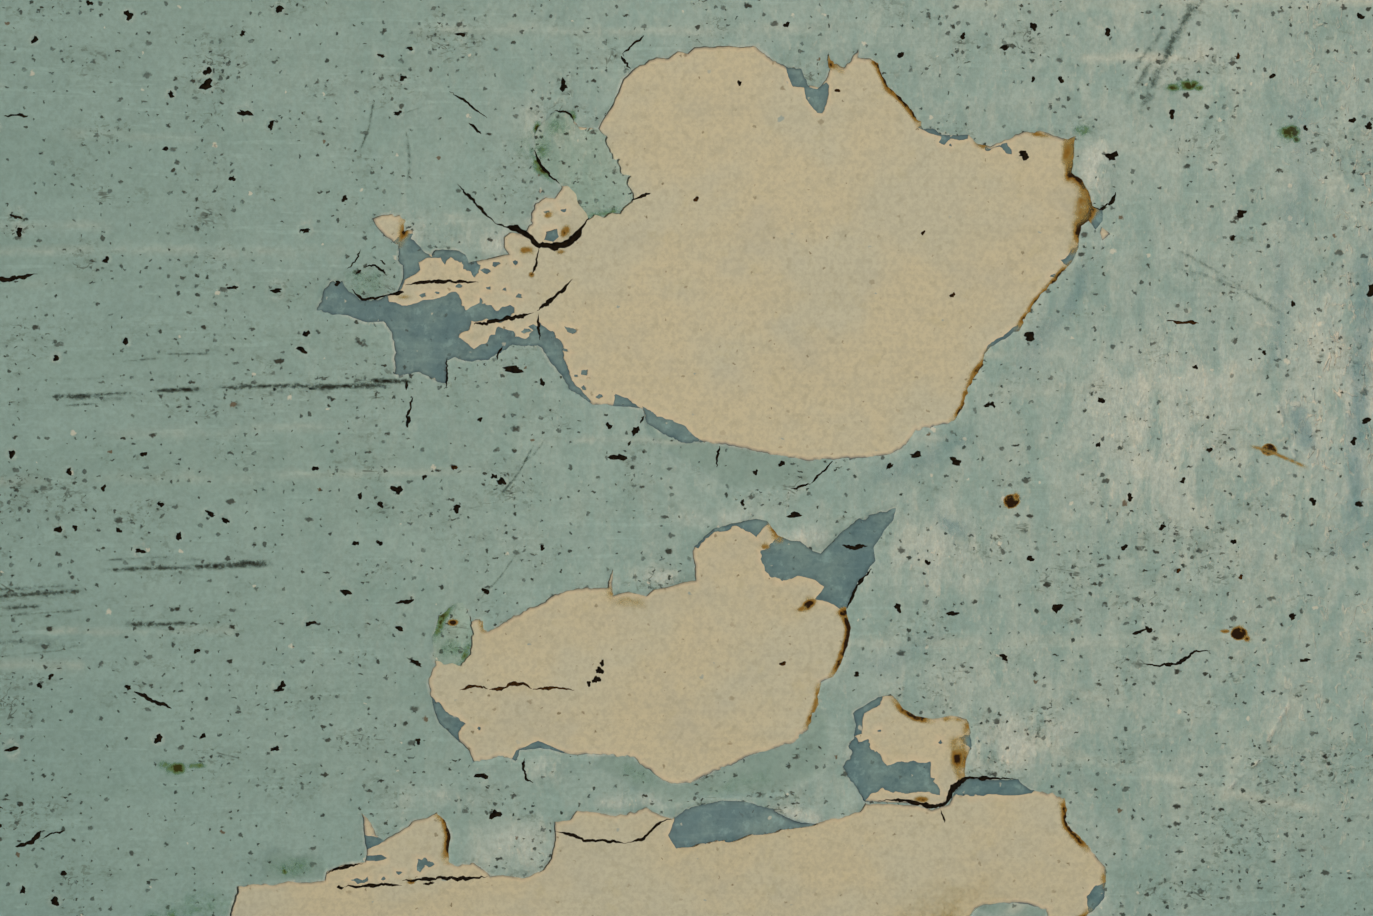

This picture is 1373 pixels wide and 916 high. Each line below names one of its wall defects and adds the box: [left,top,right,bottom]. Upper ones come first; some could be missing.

rust [871,60,920,122]
crack [348,249,476,301]
crack [458,185,589,360]
peeling [317,46,1110,461]
rust [1018,138,1097,327]
rust [954,356,984,418]
rust [798,599,816,611]
peeling [429,508,896,783]
rust [831,607,851,674]
rust [806,687,820,726]
peeling [230,695,1106,916]
crack [879,776,1013,823]